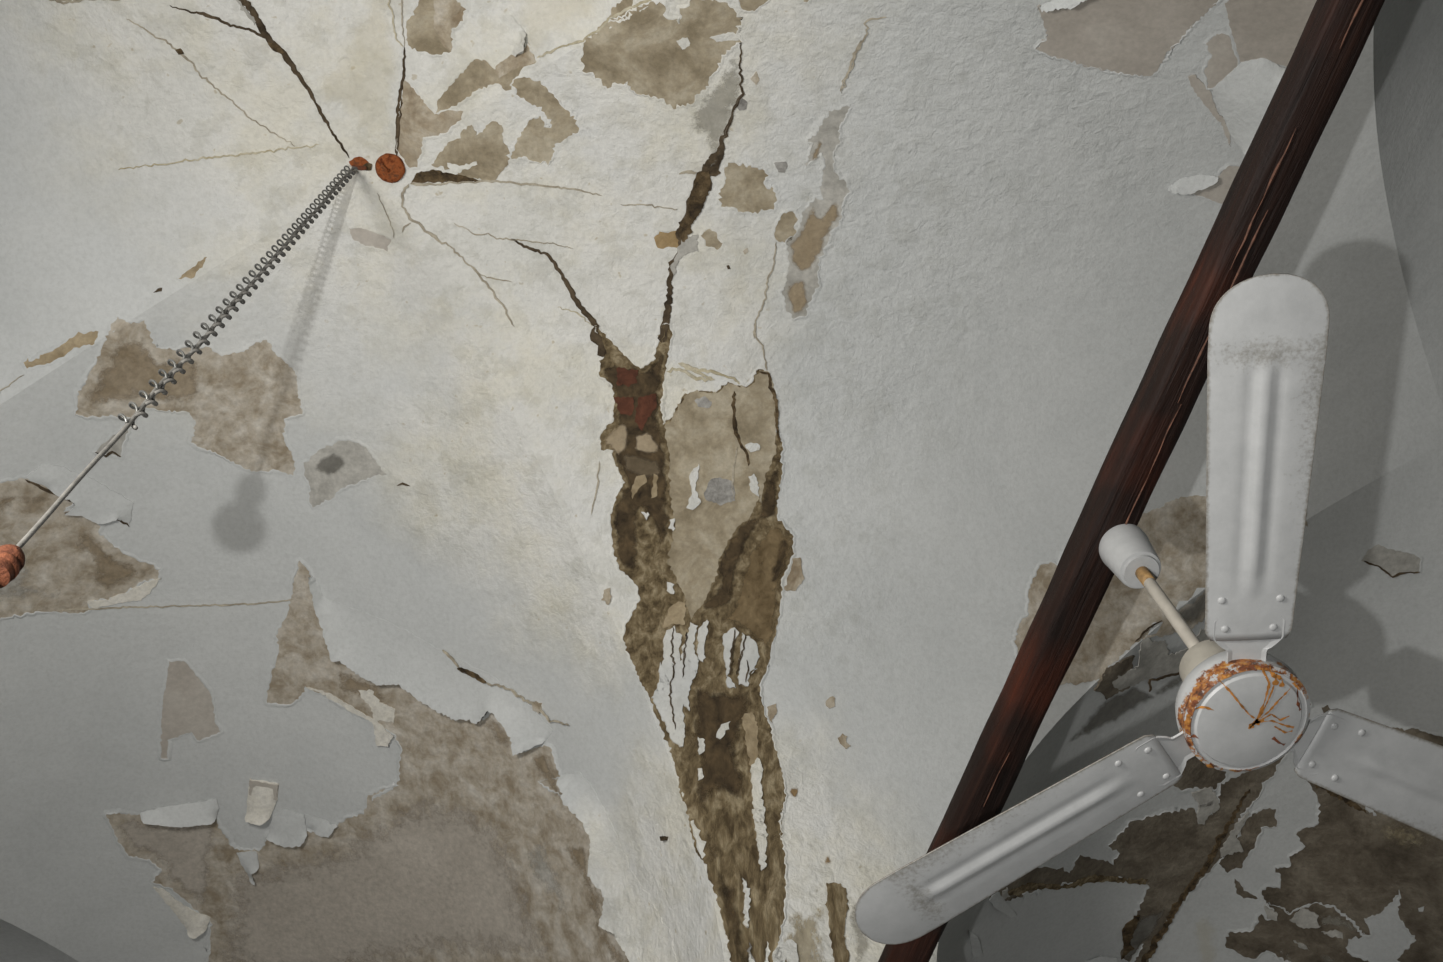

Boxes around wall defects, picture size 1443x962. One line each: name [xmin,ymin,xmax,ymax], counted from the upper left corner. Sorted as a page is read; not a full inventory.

crack [49,0,349,170]
flaking render [392,0,583,184]
crack [377,0,776,387]
flaking render [577,0,770,112]
flaking render [1032,0,1317,206]
flaking render [20,314,391,510]
flaking render [0,464,164,623]
flaking render [1010,543,1066,659]
flaking render [1060,495,1209,740]
flaking render [102,556,629,962]
leakage [785,909,822,962]
flaking render [985,751,1443,962]